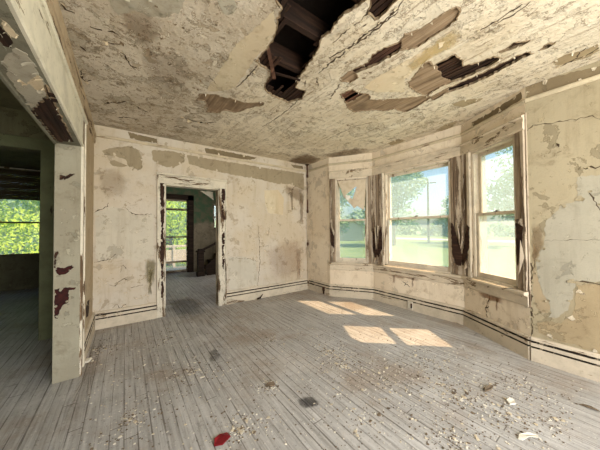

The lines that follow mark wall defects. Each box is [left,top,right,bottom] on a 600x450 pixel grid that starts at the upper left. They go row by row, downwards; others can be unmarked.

peeling [0,19,74,142]
peeling [97,84,331,190]
spalling [171,0,398,123]
crack [305,1,403,99]
spalling [337,6,531,128]
peeling [54,251,74,275]
peeling [53,287,76,319]
peeling [95,183,165,300]
peeling [533,175,600,354]